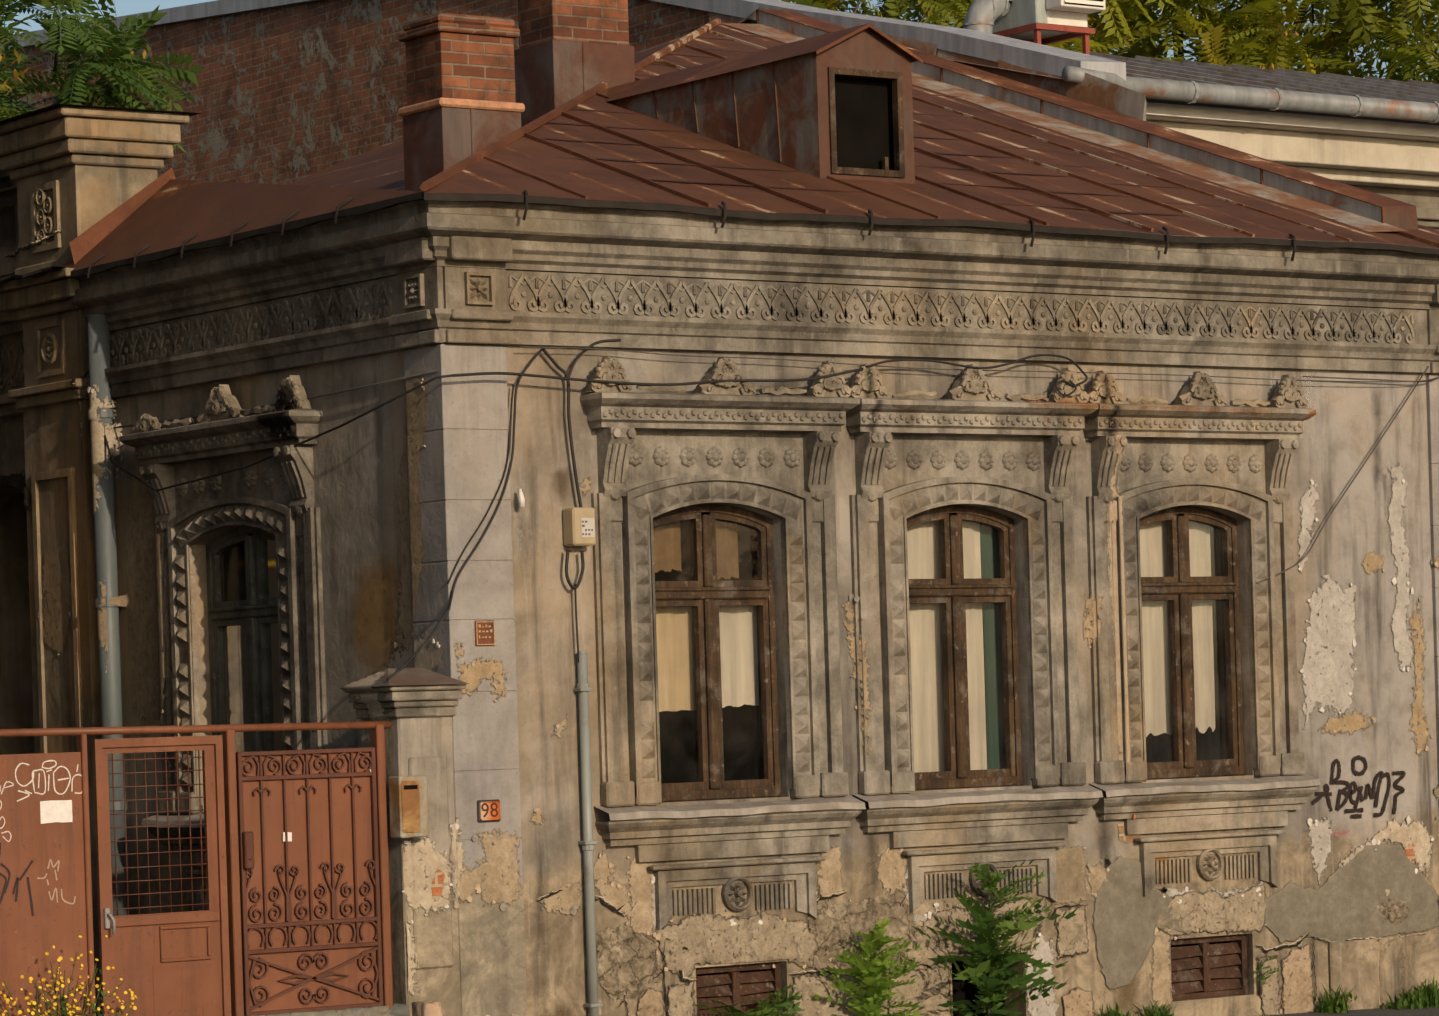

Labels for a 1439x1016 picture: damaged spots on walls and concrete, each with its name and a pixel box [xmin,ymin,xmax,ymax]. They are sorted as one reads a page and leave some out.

flaking render [341,372,509,775]
flaking render [1297,461,1433,756]
flaking render [401,817,1110,1016]
flaking render [1149,881,1267,1011]
flaking render [1257,943,1314,1015]
flaking render [1307,815,1438,886]
flaking render [1376,889,1411,925]